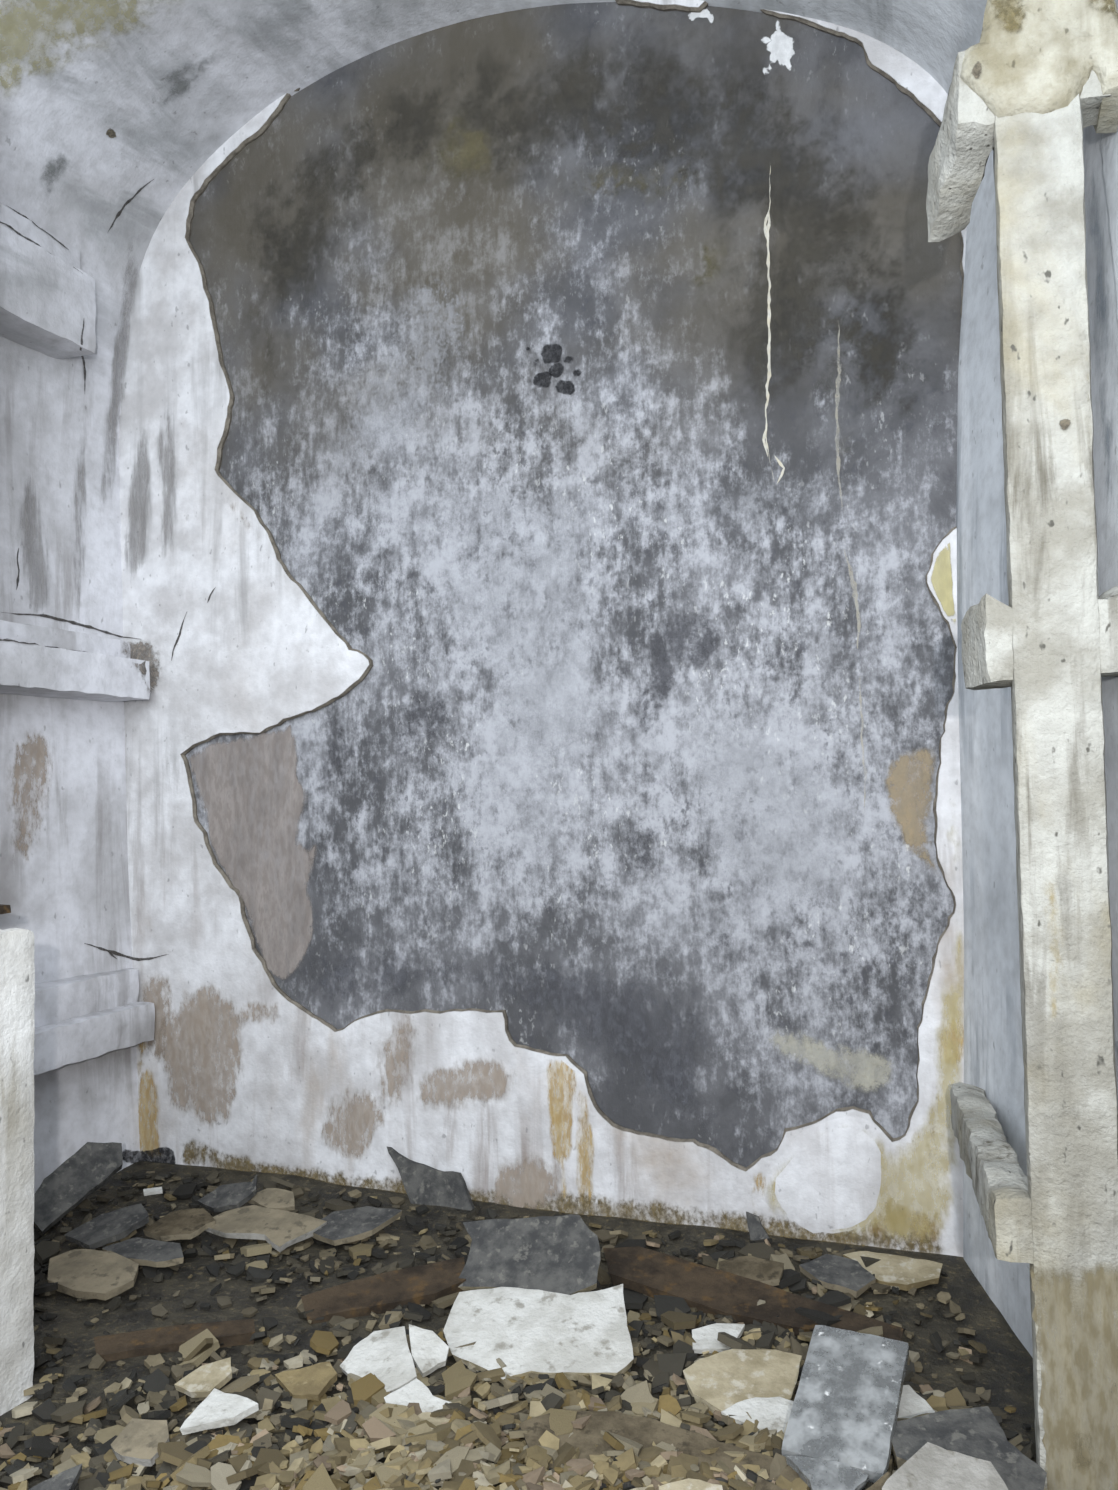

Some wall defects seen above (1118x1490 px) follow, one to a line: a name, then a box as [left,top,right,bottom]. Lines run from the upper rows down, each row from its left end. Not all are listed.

spalling [972,61,982,78]
crack [0,206,82,273]
crack [108,179,154,232]
leakage [460,61,889,381]
crack [762,166,785,483]
leakage [526,344,581,395]
spalling [180,0,964,1171]
crack [849,571,861,648]
leakage [143,978,276,1123]
leakage [322,1024,412,1157]
leakage [422,1061,507,1104]
leakage [122,1147,176,1164]